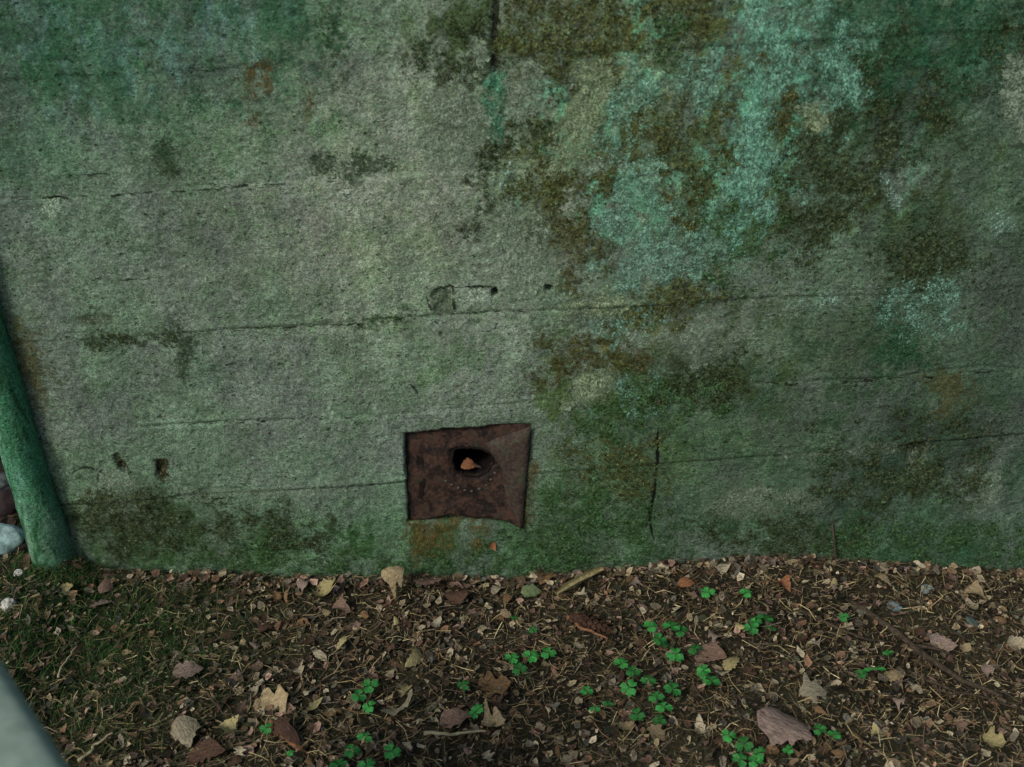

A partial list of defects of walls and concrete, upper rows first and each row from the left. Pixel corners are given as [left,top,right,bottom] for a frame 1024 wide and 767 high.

crack [490,0,500,88]
water stain [420,283,494,350]
spalling [156,459,169,484]
crack [646,429,659,541]